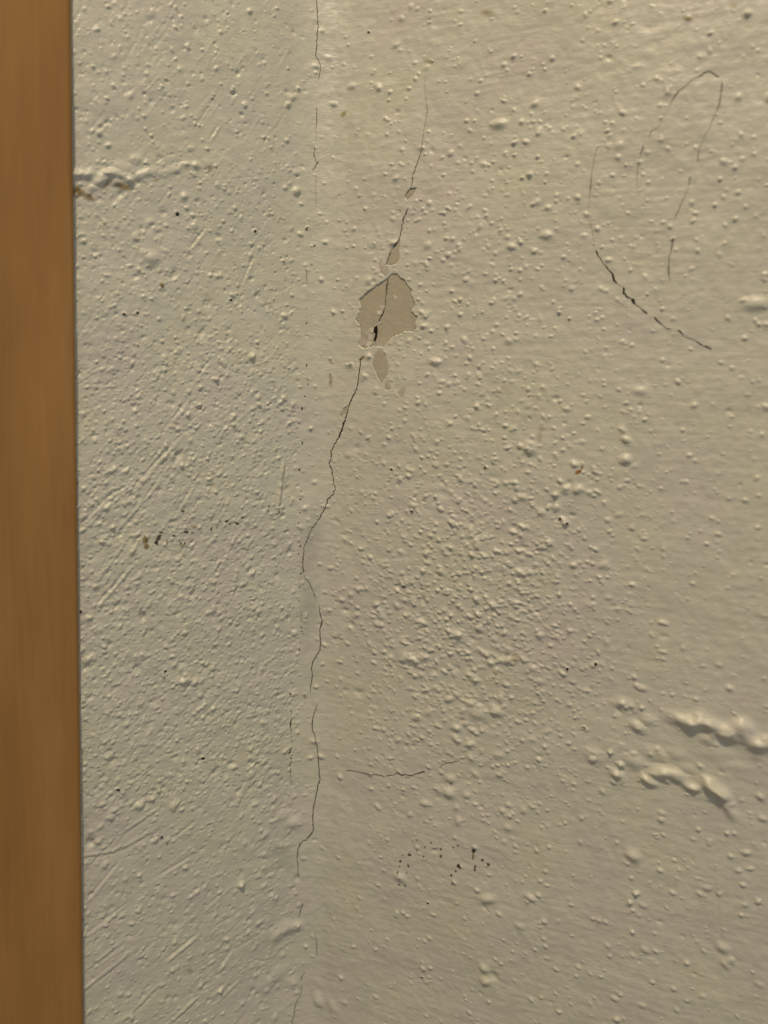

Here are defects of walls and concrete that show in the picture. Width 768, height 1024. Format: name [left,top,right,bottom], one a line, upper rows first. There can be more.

crack [314,0,322,80]
crack [386,139,423,264]
peeling [356,241,417,398]
crack [596,251,711,349]
crack [288,362,361,874]
crack [348,758,465,777]